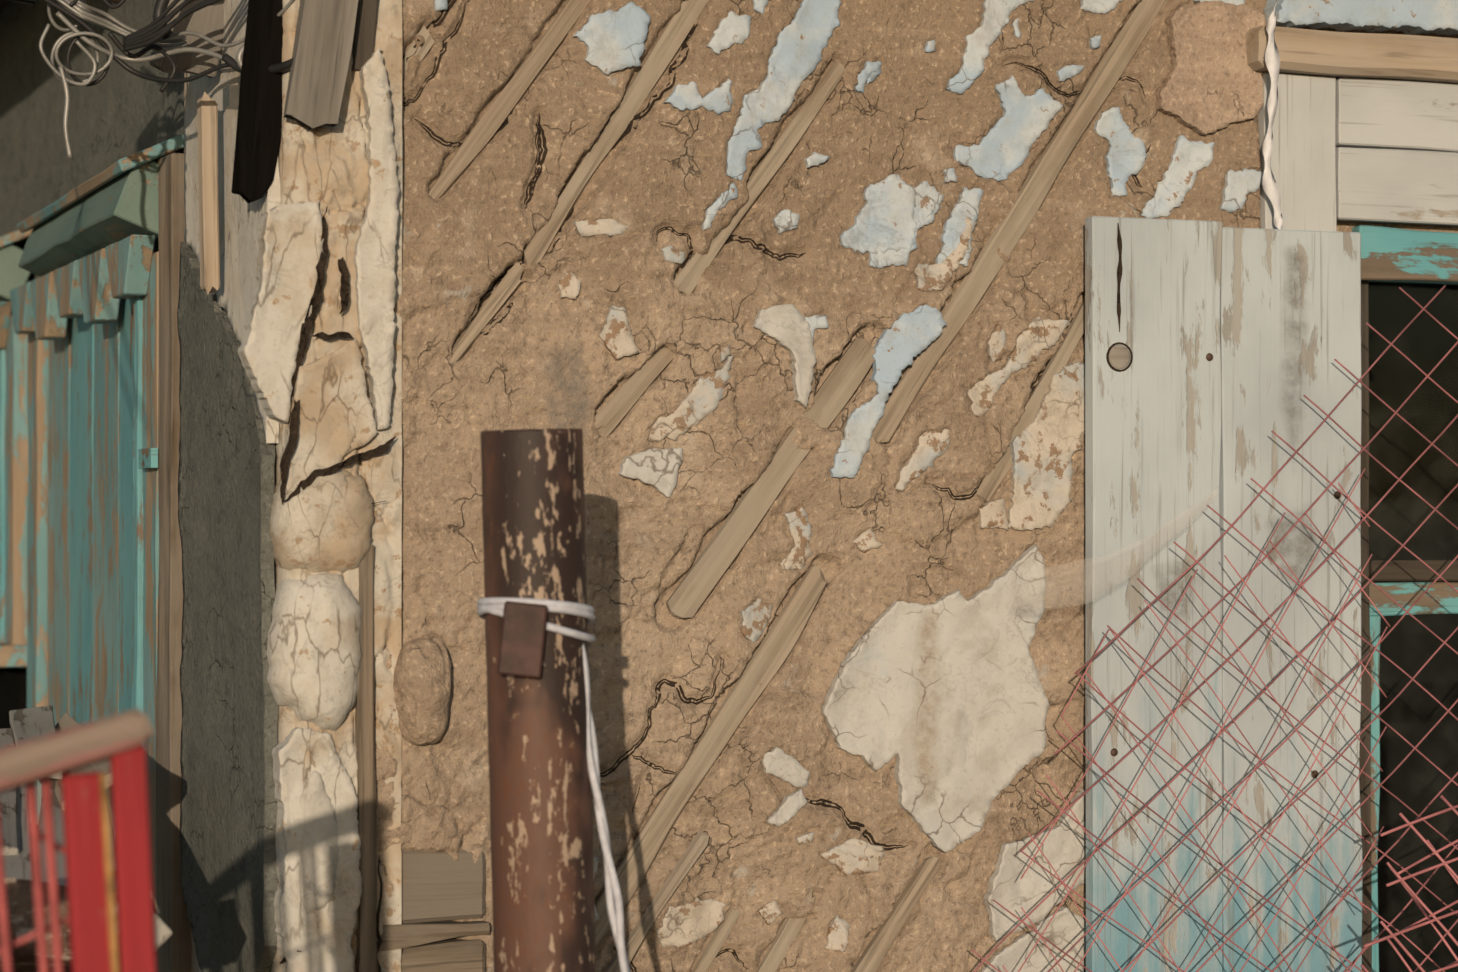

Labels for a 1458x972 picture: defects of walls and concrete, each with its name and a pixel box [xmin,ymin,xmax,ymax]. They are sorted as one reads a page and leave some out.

flaking render [184,0,400,495]
crack [280,206,396,504]
crack [402,0,548,208]
crack [464,23,698,335]
crack [656,226,806,261]
peeling [663,0,842,234]
peeling [829,0,1101,478]
crack [1005,62,1082,97]
crack [1116,223,1124,332]
flaking render [1140,0,1458,218]
flaking render [821,362,1085,853]
flaking render [980,790,1086,972]